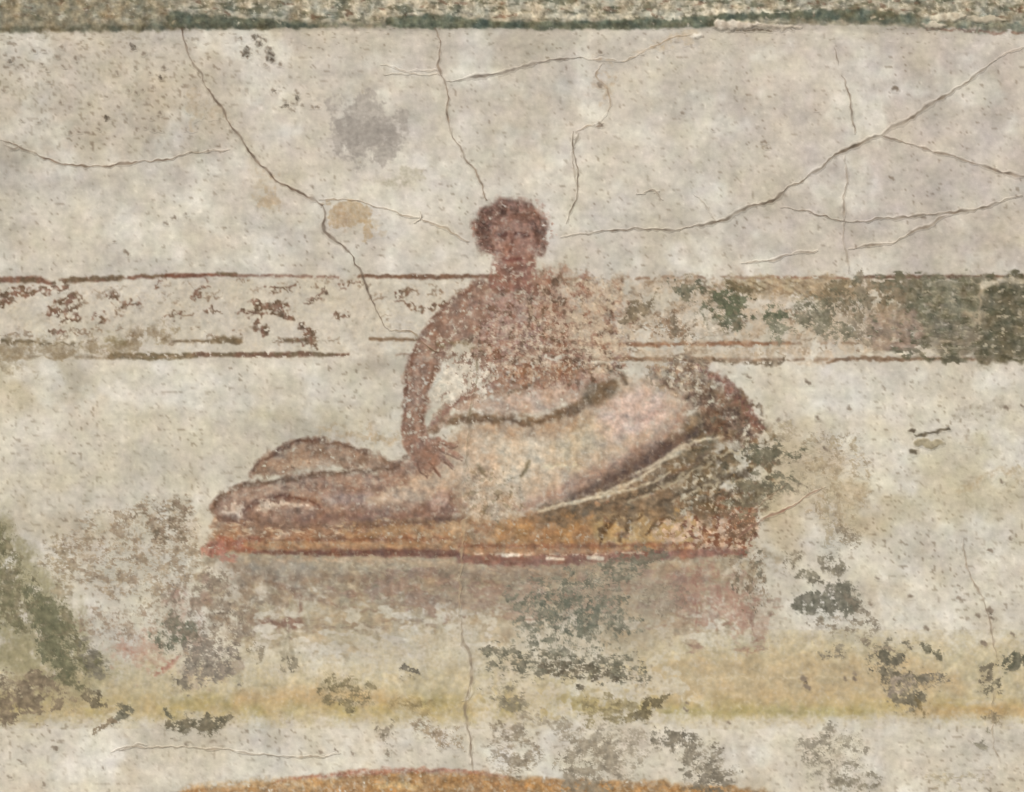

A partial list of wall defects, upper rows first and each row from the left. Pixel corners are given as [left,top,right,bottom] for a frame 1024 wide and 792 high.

crack [0,27,469,353]
damp [309,85,429,201]
crack [381,27,1024,272]
crack [464,348,480,475]
damp [0,653,131,728]
crack [111,742,341,759]
crack [457,511,476,776]